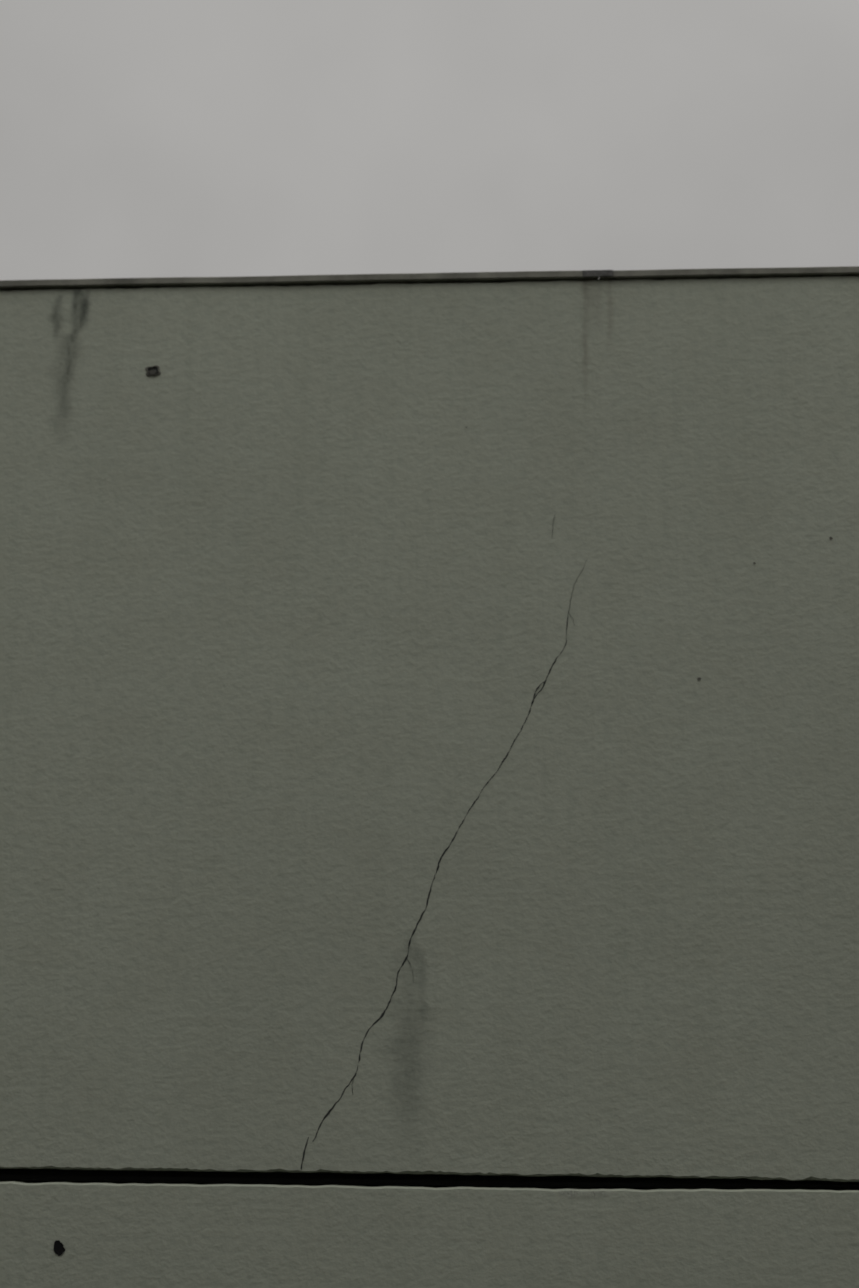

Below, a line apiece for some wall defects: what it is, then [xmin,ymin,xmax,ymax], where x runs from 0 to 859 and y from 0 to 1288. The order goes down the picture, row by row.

crack [301,560,587,1169]